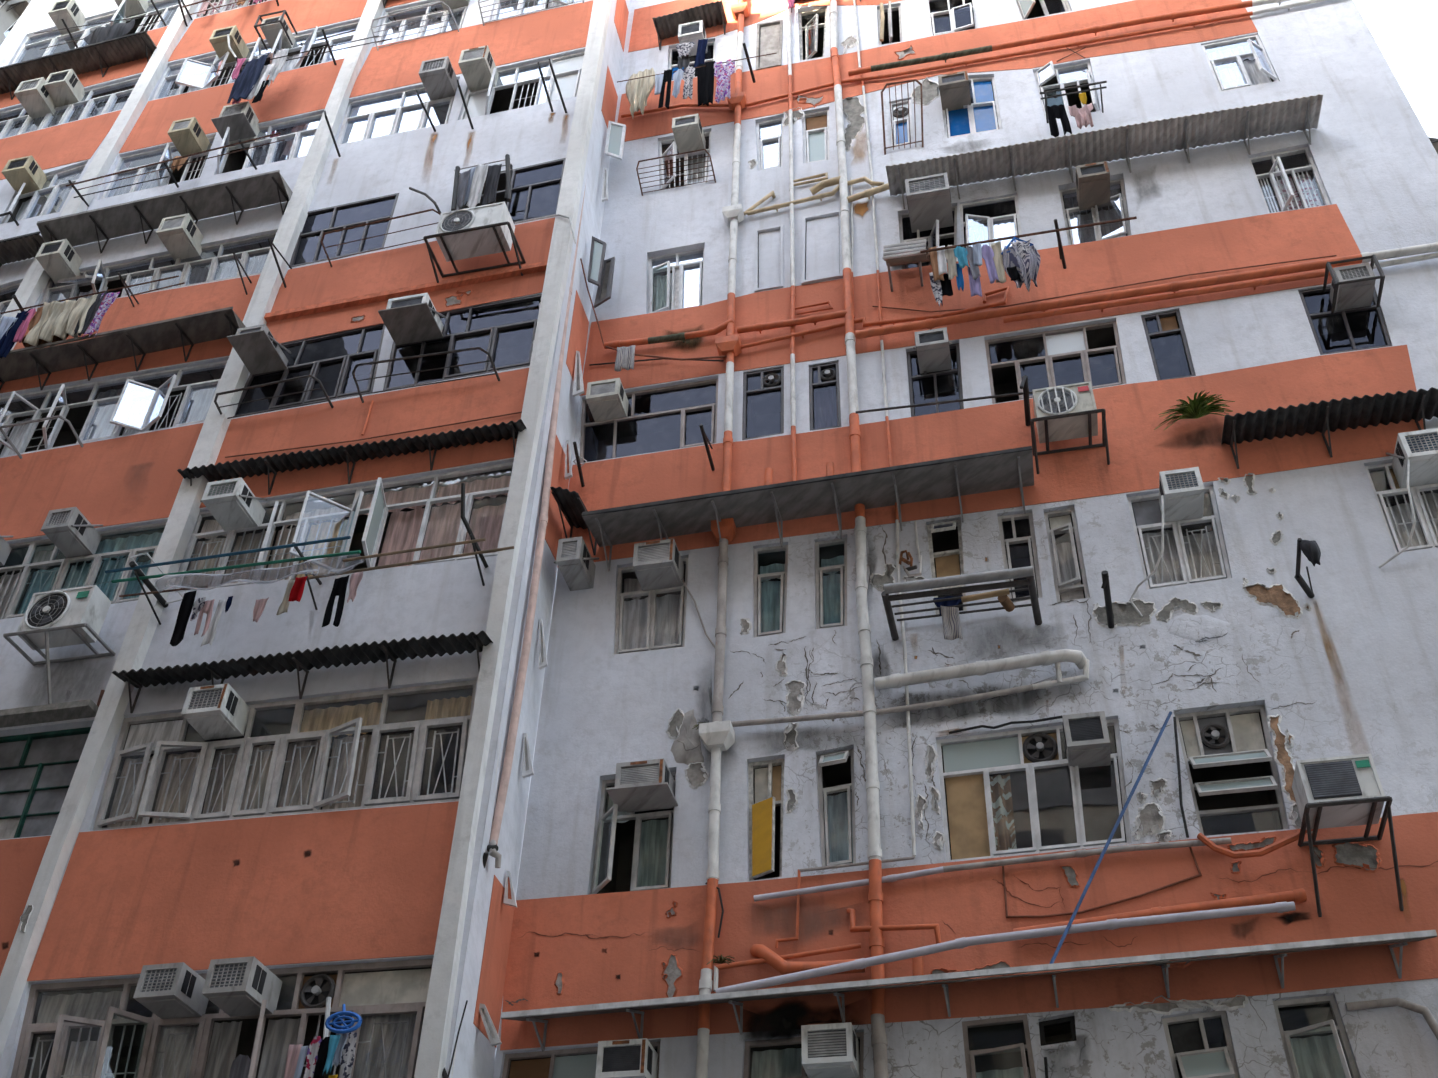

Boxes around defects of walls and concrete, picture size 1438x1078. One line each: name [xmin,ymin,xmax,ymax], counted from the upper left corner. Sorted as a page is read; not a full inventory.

peeling [842,97,865,152]
peeling [1218,473,1276,503]
crack [882,528,891,579]
peeling [1269,512,1284,546]
peeling [1092,597,1223,628]
spalling [1242,568,1312,619]
crack [728,630,881,712]
peeling [665,708,684,739]
peeling [915,744,946,851]
peeling [1131,778,1172,843]
peeling [1267,714,1382,873]
crack [519,932,699,952]